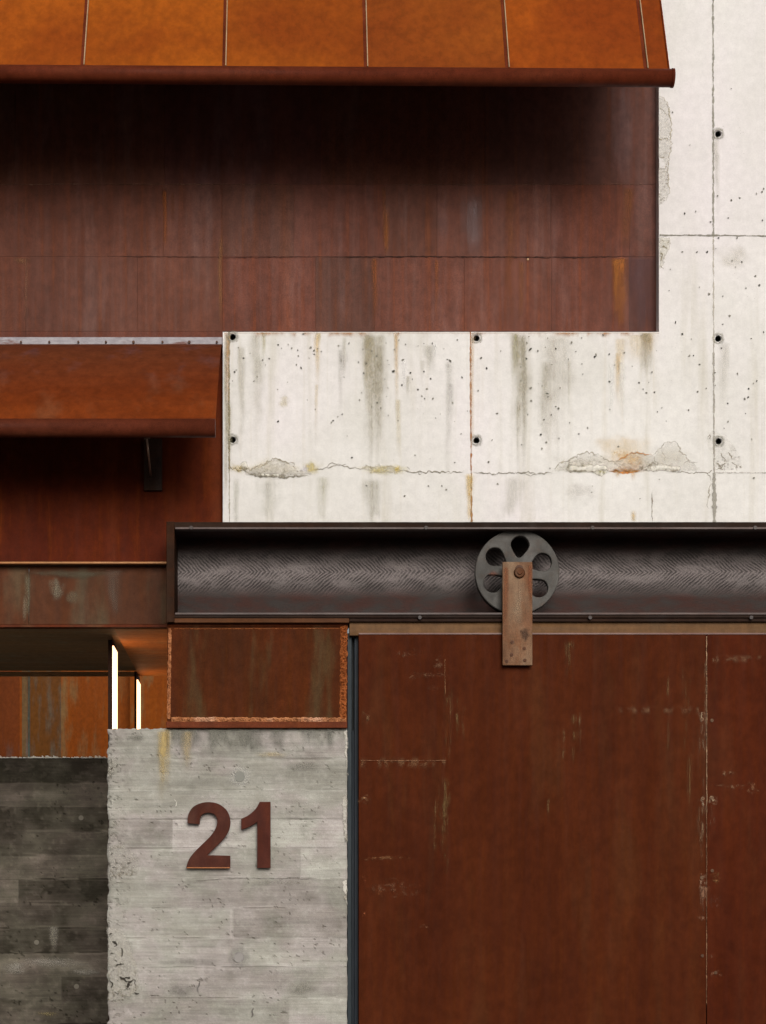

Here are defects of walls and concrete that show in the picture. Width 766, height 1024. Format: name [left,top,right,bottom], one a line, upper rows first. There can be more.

spalling [240,458,314,479]
crack [405,469,550,477]
spalling [555,441,696,476]